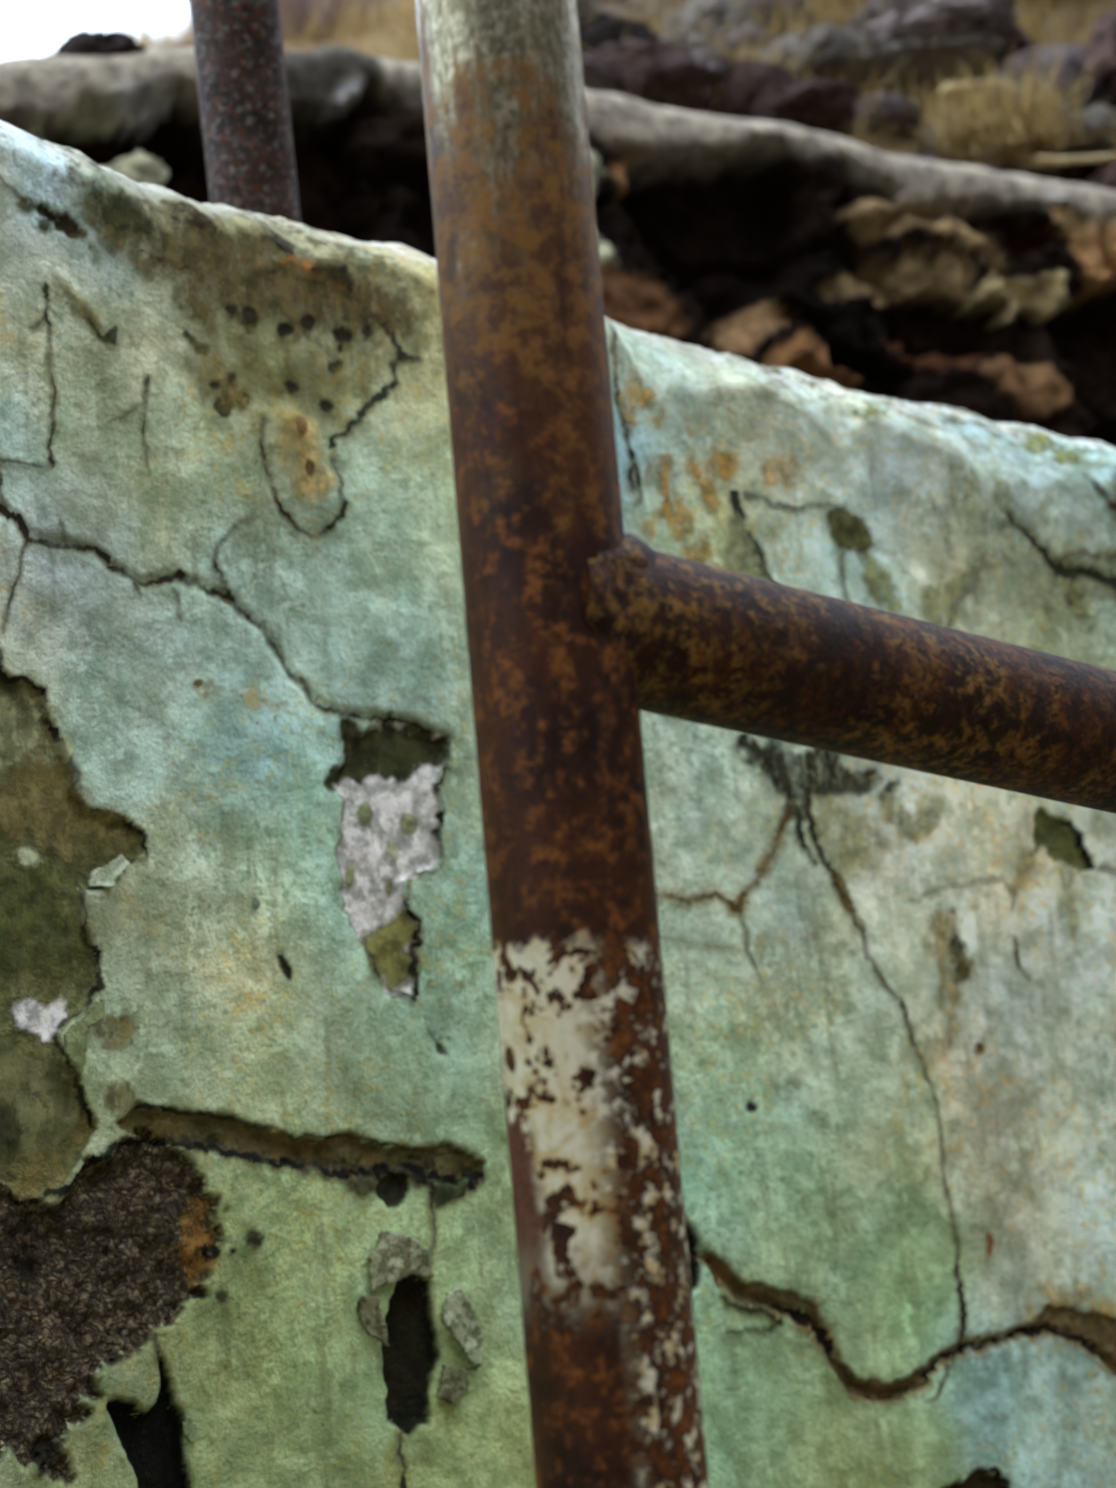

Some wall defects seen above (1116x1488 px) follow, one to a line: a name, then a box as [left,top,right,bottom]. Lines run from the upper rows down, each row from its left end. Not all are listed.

crack [135,249,423,449]
corrosion [619,380,662,424]
crack [0,281,436,740]
corrosion [644,447,737,563]
crack [725,489,874,601]
crack [1005,511,1116,604]
peeling [325,713,451,1002]
spalling [277,954,292,980]
peeling [0,648,265,1488]
crack [656,776,1116,1403]
spalling [357,1180,484,1488]
spalling [686,1223,700,1290]